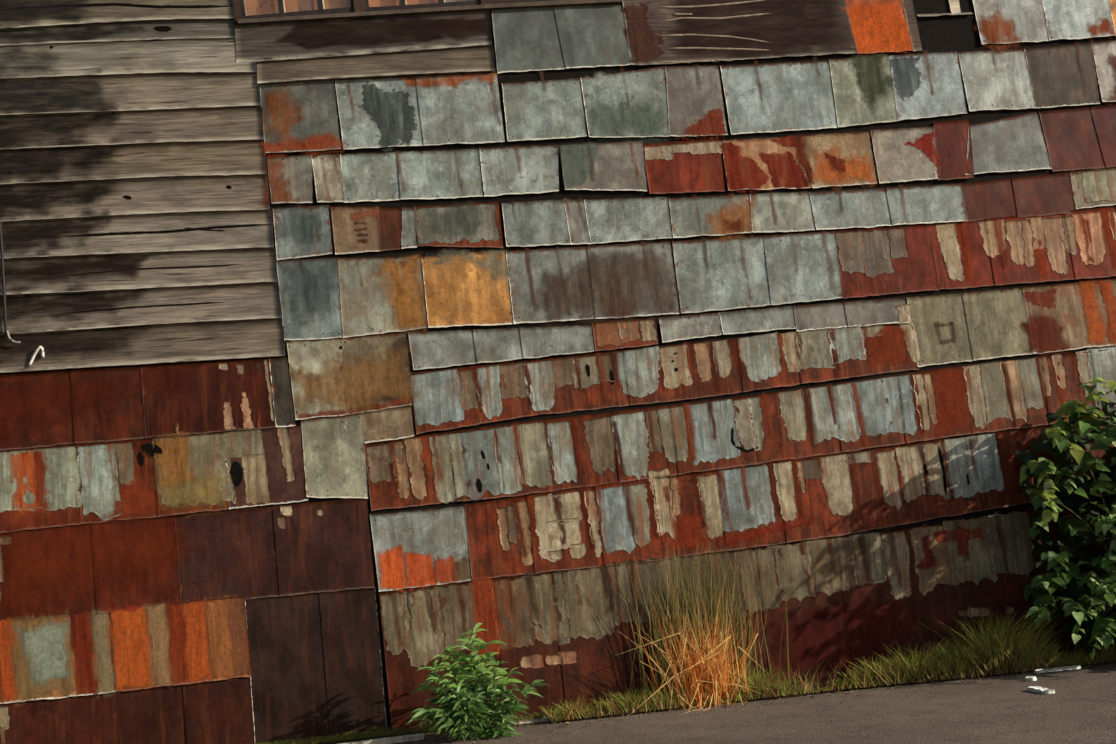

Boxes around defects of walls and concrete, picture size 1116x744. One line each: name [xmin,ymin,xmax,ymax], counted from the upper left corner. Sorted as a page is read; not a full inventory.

rust [851,5,910,51]
rust [980,11,1019,61]
rust [1088,19,1114,37]
water stain [352,81,418,153]
rust [906,132,941,167]
rust [675,108,874,267]
peeling [836,228,909,278]
peeling [936,223,965,282]
peeling [979,169,1116,275]
peeling [0,442,136,521]
peeling [367,304,1116,669]
rust [0,595,250,705]